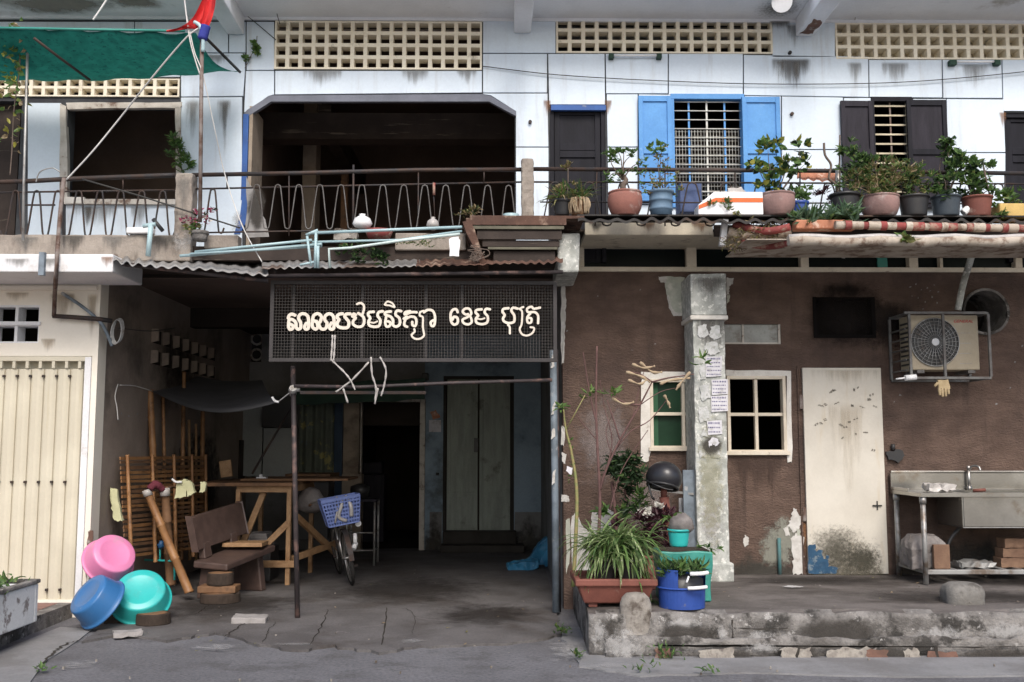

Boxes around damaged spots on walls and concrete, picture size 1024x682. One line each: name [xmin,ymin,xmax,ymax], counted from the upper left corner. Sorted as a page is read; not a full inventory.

water stain [778,60,808,78]
peeling [783,508,804,575]
water stain [659,619,727,639]
water stain [733,633,770,658]
water stain [801,620,881,657]
water stain [881,648,912,657]
water stain [963,649,1024,657]
water stain [990,626,1024,637]